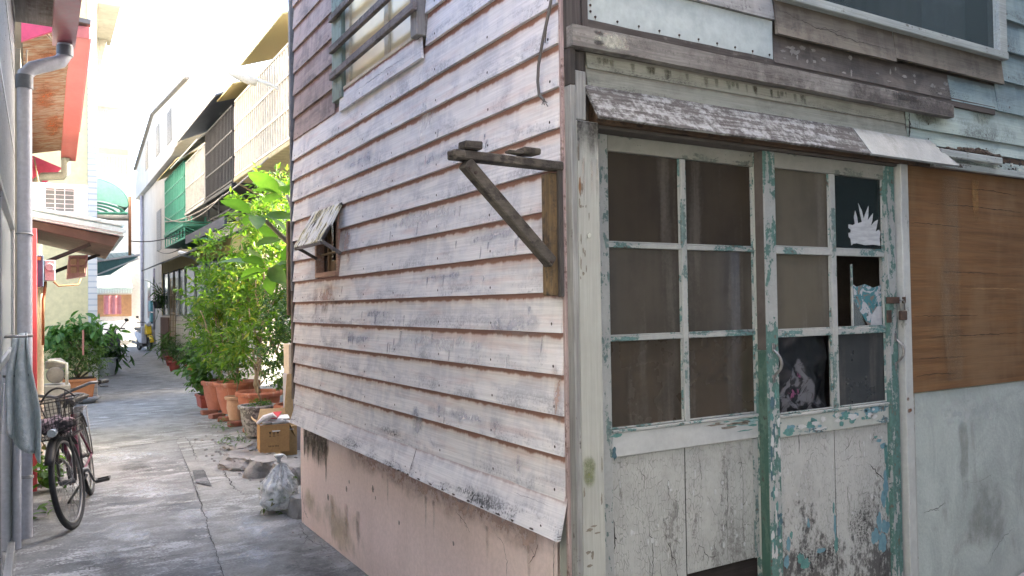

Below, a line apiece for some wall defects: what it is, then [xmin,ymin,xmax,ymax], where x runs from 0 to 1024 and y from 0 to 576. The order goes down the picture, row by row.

peeling [780,46,826,63]
crack [80,438,242,576]
water stain [304,429,328,466]
water stain [359,453,536,545]
crack [613,455,749,576]
peeling [708,390,880,569]
peeling [863,434,890,552]